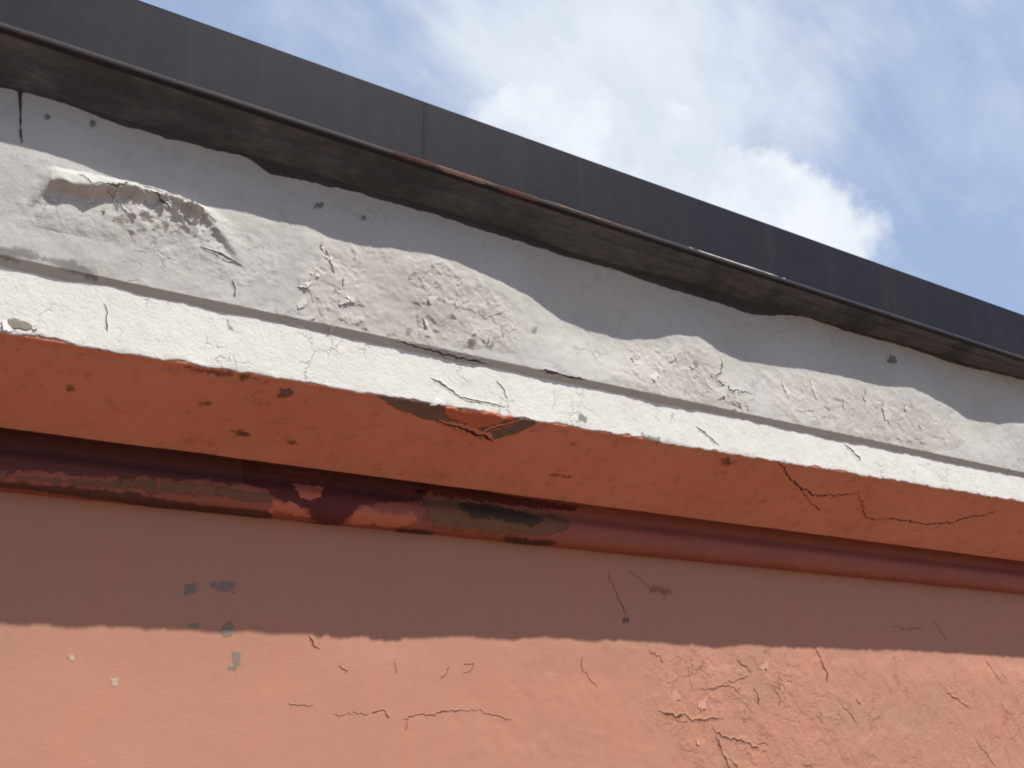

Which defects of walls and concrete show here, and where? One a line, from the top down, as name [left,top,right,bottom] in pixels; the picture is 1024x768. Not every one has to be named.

spalling [2,317,41,332]
peeling [296,239,537,353]
crack [394,340,507,407]
spalling [376,395,537,442]
peeling [0,428,577,537]
crack [777,461,1000,527]
crack [308,636,319,649]
crack [337,709,507,730]
crack [658,659,781,768]